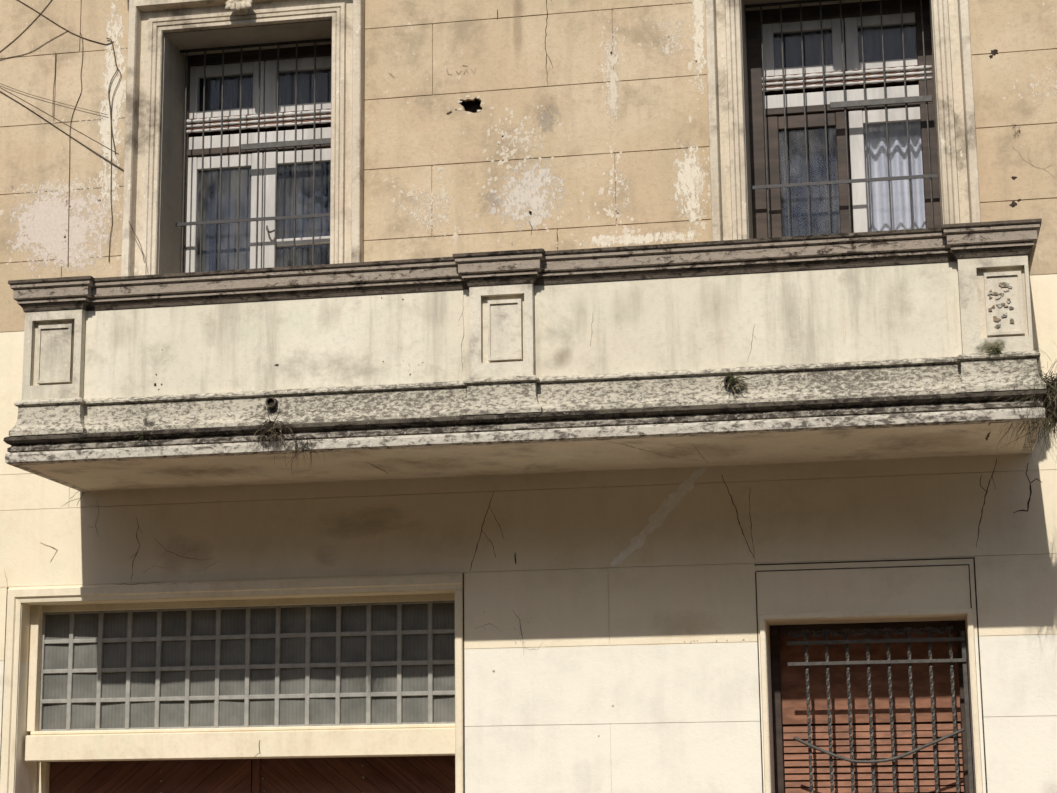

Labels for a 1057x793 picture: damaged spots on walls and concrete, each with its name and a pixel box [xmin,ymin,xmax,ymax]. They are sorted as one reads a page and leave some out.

crack [545,0,553,87]
peeling [0,0,127,278]
peeling [387,0,711,248]
crack [469,493,516,572]
crack [597,439,755,566]
crack [976,421,1002,547]
crack [1013,464,1041,513]